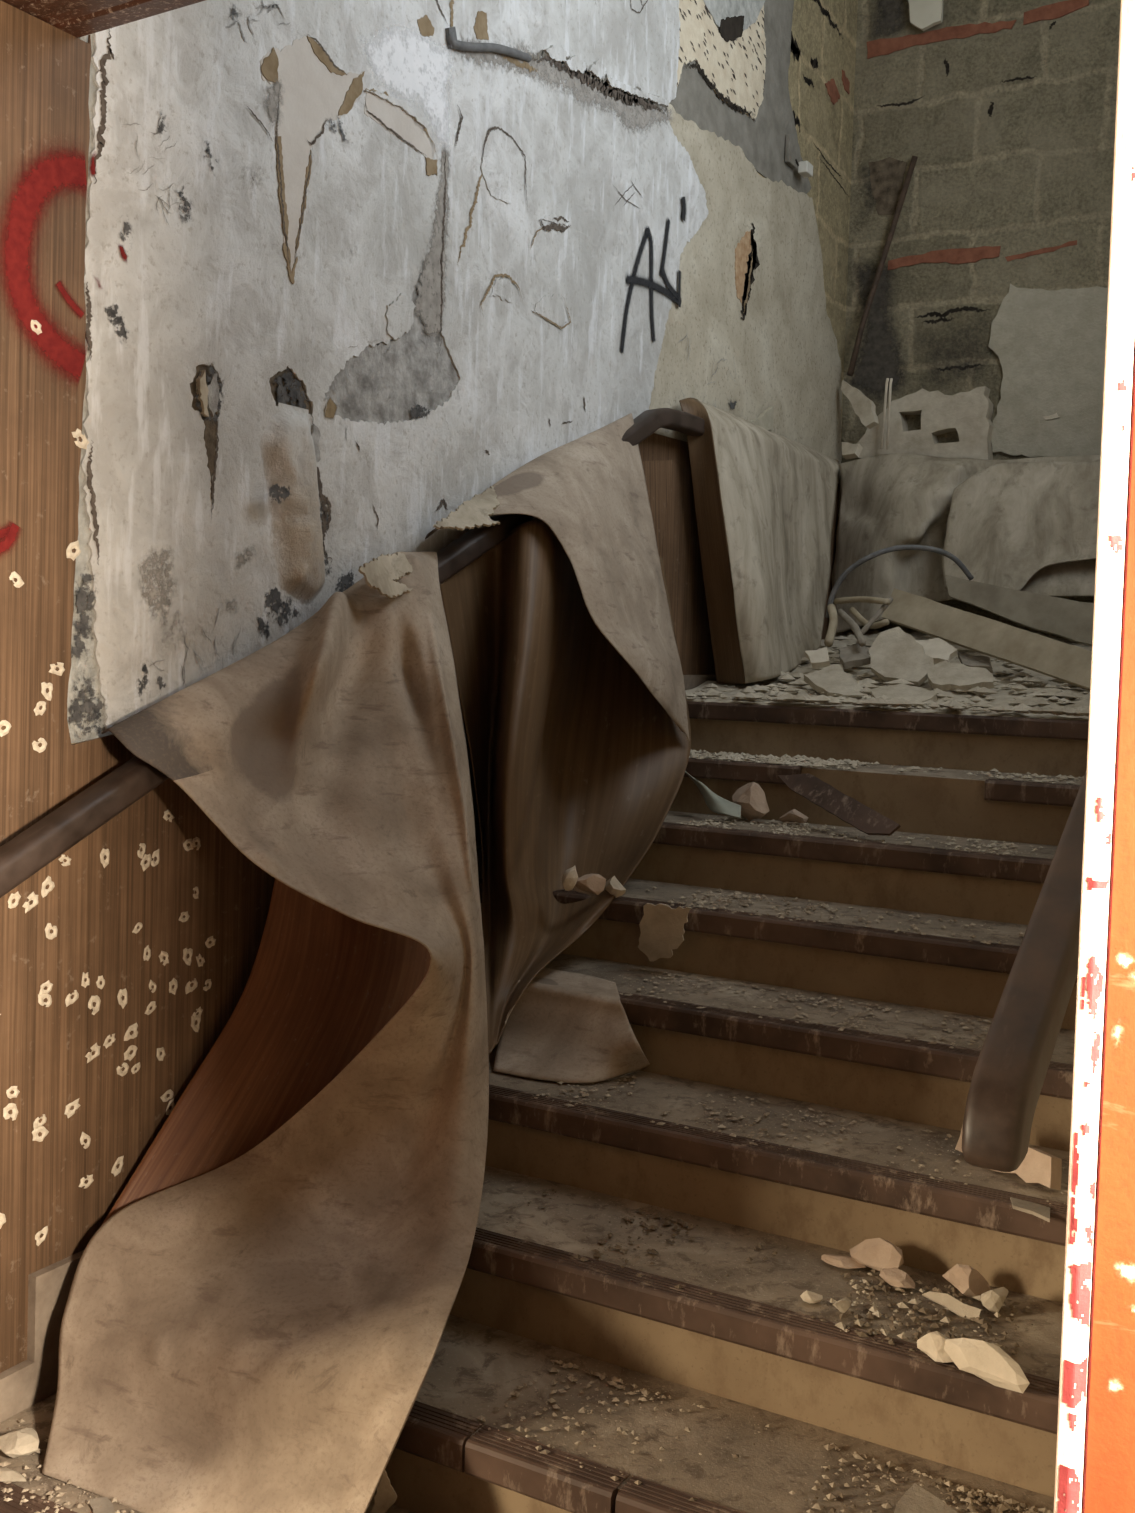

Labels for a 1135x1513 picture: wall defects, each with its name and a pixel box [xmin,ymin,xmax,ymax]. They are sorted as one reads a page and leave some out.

peeling [473,11,489,40]
spalling [676,0,766,122]
spalling [867,0,1089,59]
peeling [249,0,459,562]
spalling [734,223,760,320]
spalling [888,240,1077,270]
peeling [190,364,223,513]
spalling [856,386,993,460]